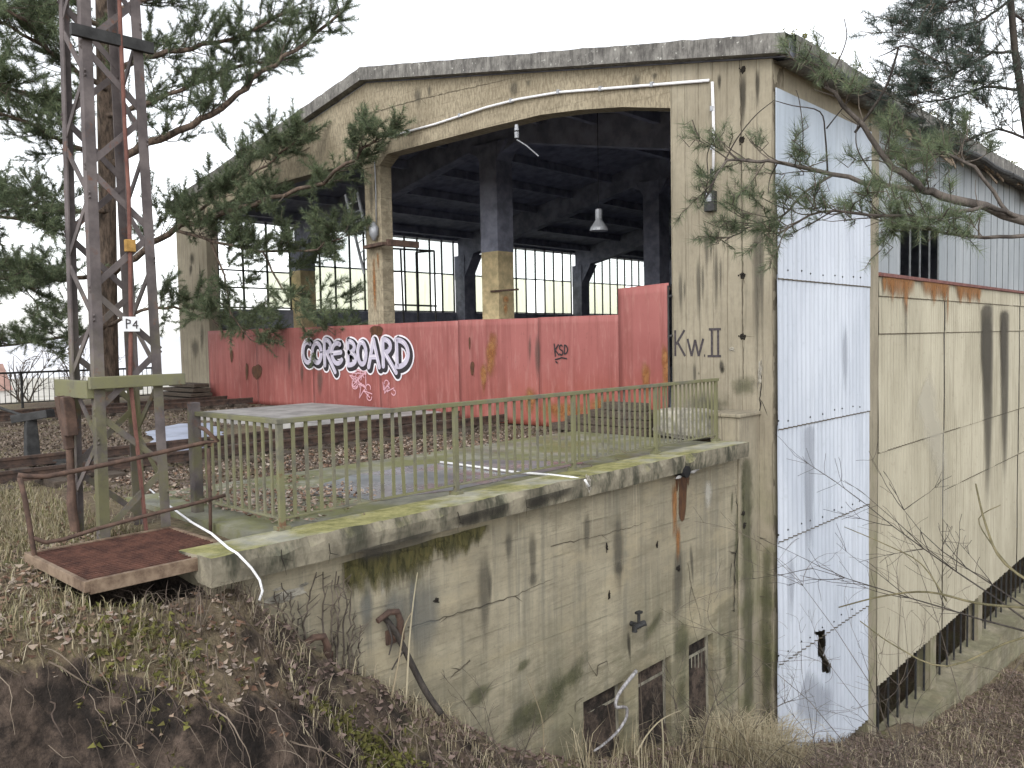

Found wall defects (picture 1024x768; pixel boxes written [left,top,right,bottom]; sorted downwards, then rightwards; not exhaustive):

corrosion [883,277,982,319]
corrosion [469,336,495,386]
leakage [982,305,1008,471]
leakage [345,504,507,585]
crack [551,525,638,547]
corrosion [672,476,689,552]
crack [408,580,550,628]